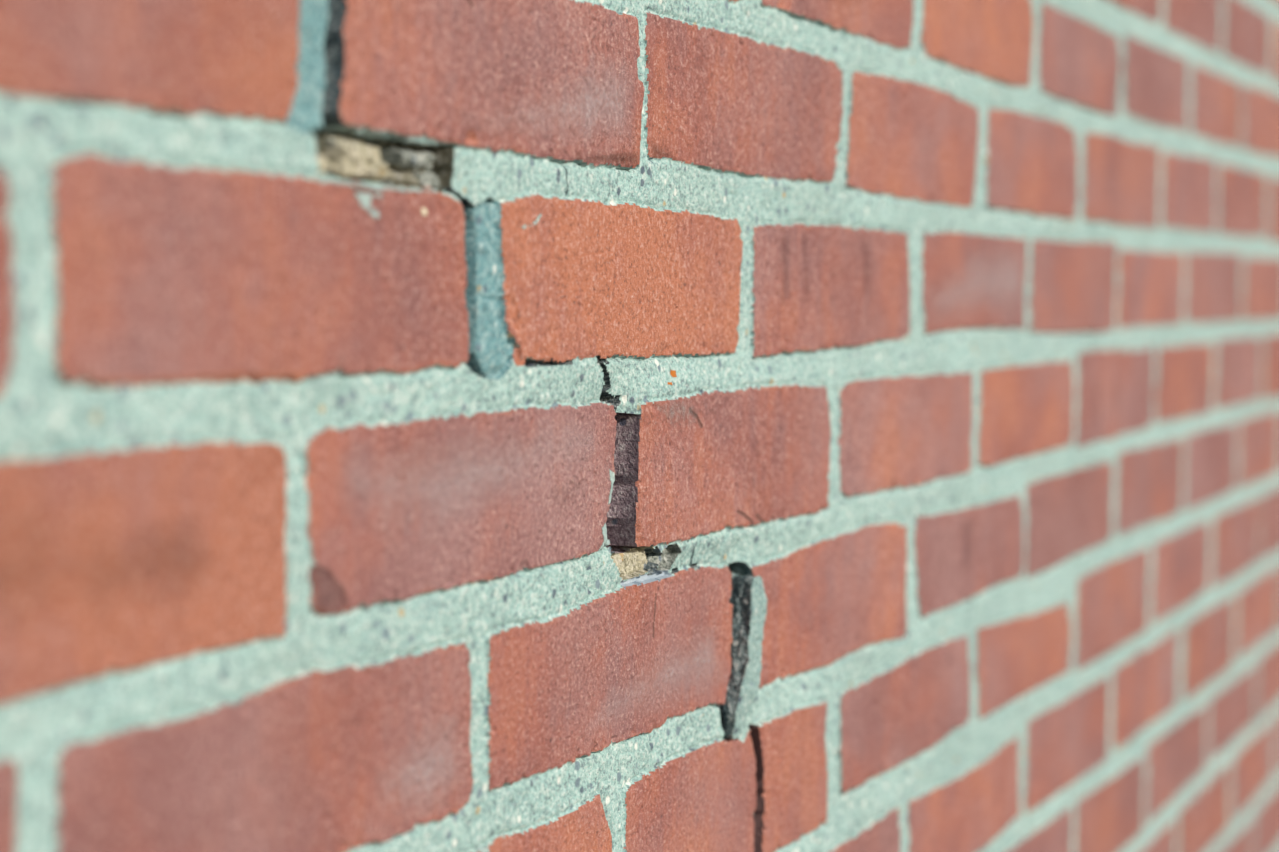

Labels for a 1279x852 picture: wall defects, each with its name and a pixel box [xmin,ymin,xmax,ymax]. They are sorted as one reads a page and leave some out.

crack [322,0,349,125]
spalling [311,126,478,218]
crack [445,189,493,208]
crack [561,162,569,196]
crack [524,356,754,638]
crack [737,509,764,526]
crack [718,704,765,852]